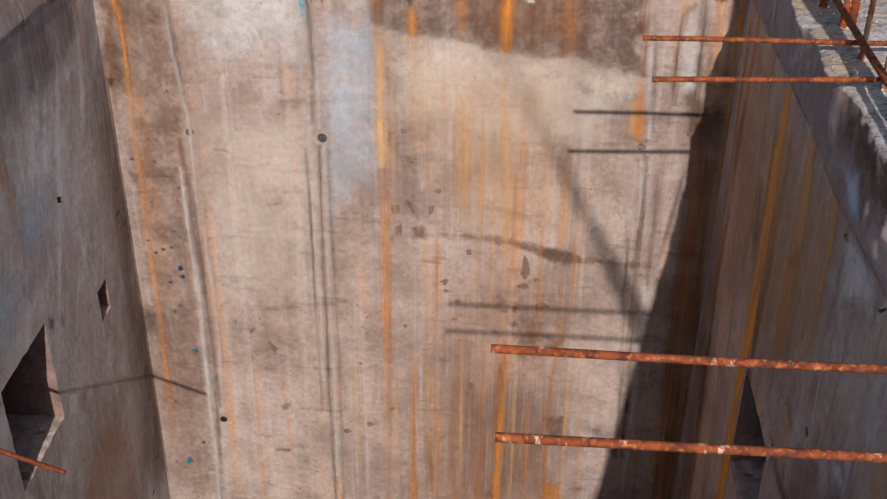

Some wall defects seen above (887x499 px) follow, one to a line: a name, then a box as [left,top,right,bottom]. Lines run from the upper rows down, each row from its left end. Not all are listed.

corrosion [502,0,513,48]
water stain [402,0,644,71]
water stain [462,235,601,289]
corrosion [712,88,791,499]